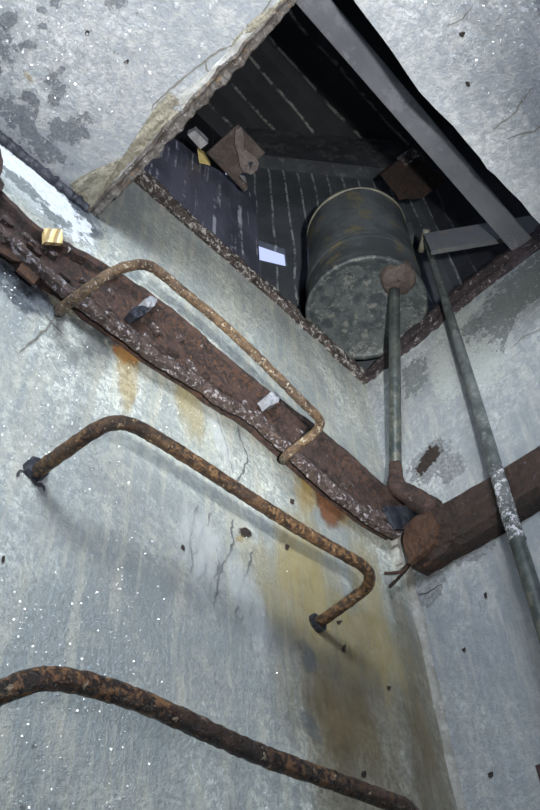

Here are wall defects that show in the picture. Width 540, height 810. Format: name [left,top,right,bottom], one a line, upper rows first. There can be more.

rust [113,342,138,364]
rust [303,480,344,527]